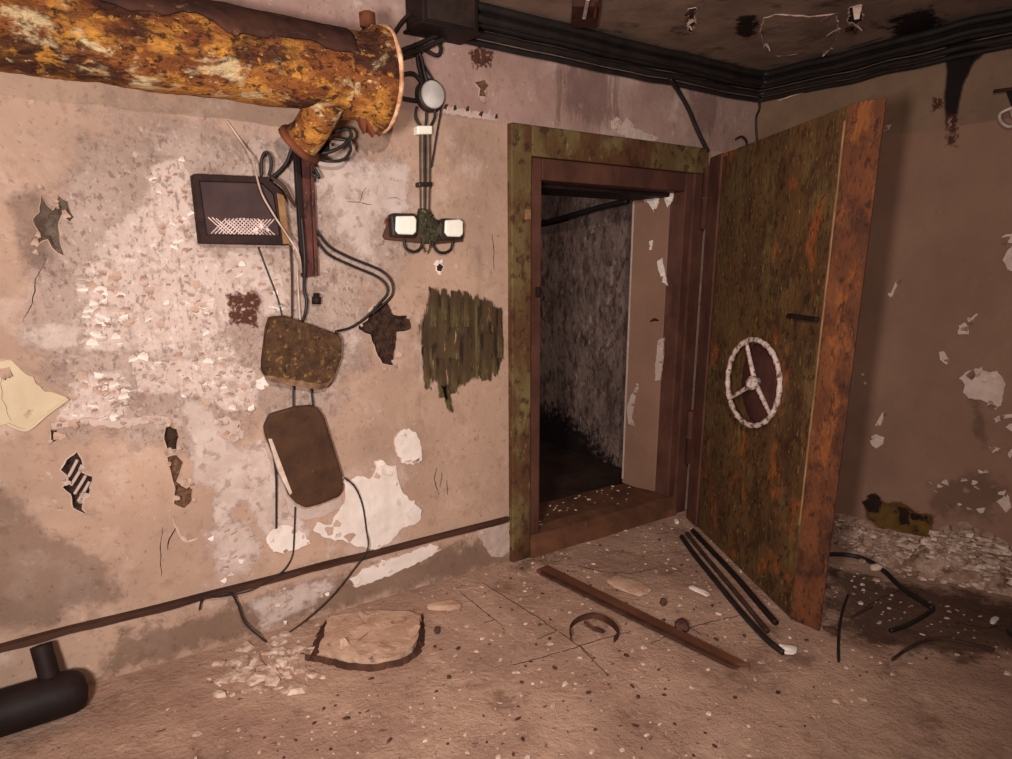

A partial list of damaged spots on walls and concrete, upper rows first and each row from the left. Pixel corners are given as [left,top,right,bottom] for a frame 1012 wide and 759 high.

water stain [735,15,760,37]
peeling [760,4,864,57]
water stain [883,5,949,38]
water stain [945,113,959,148]
crack [23,262,45,320]
peeling [223,251,290,315]
peeling [0,156,269,515]
flaking render [358,302,412,373]
water stain [417,287,504,413]
peeling [958,367,1012,432]
peeling [204,428,442,588]
water stain [862,493,933,536]